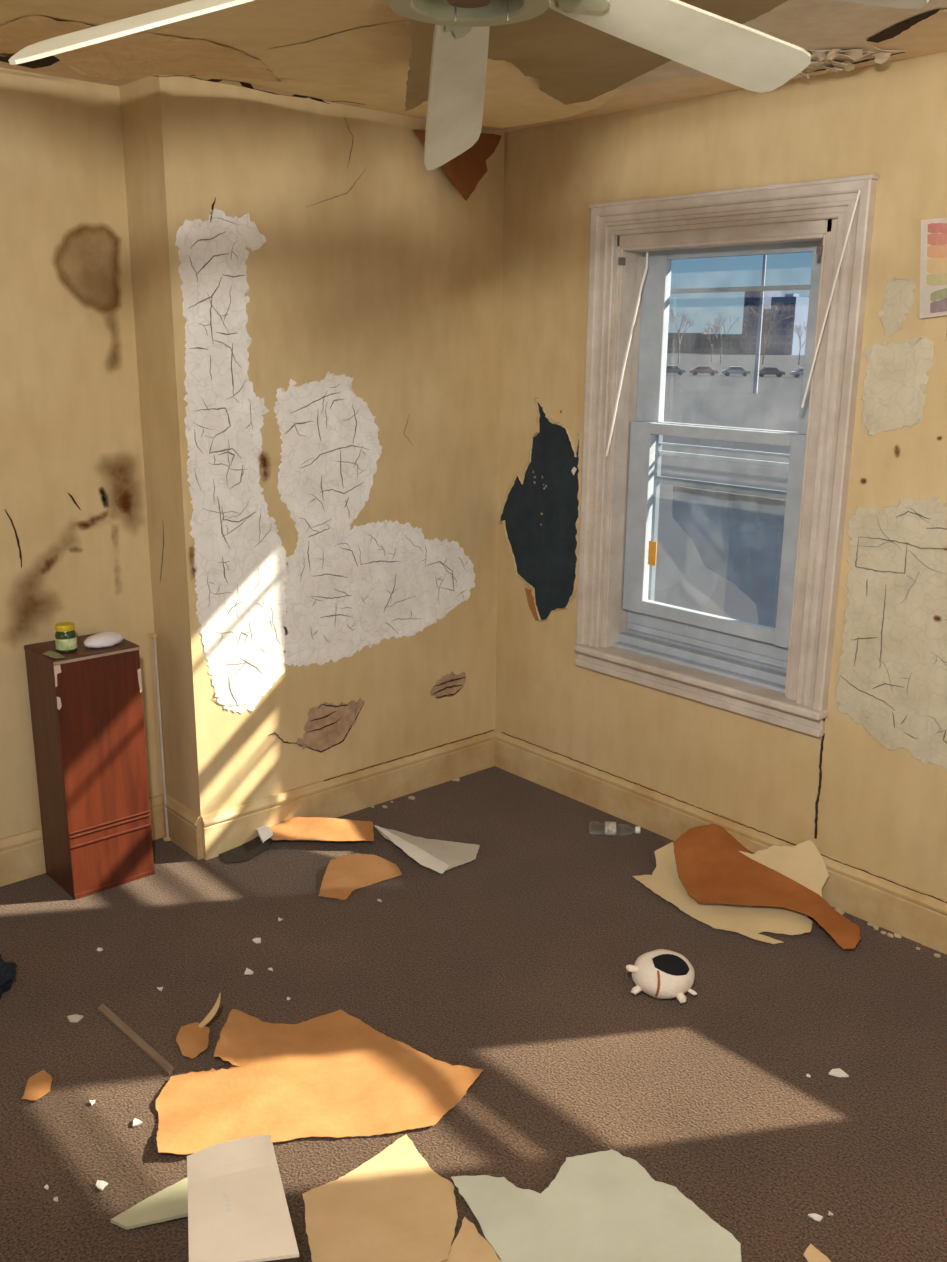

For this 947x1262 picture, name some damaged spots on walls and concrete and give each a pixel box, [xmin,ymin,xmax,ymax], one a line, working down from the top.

peeling [619,60,713,89]
peeling [742,0,947,79]
peeling [441,133,502,201]
leakage [57,227,119,311]
peeling [861,277,934,436]
leakage [80,464,134,528]
peeling [175,208,475,714]
spalling [498,397,582,622]
leakage [18,581,45,631]
peeling [835,495,947,770]
spalling [268,698,364,753]
crack [324,730,947,915]